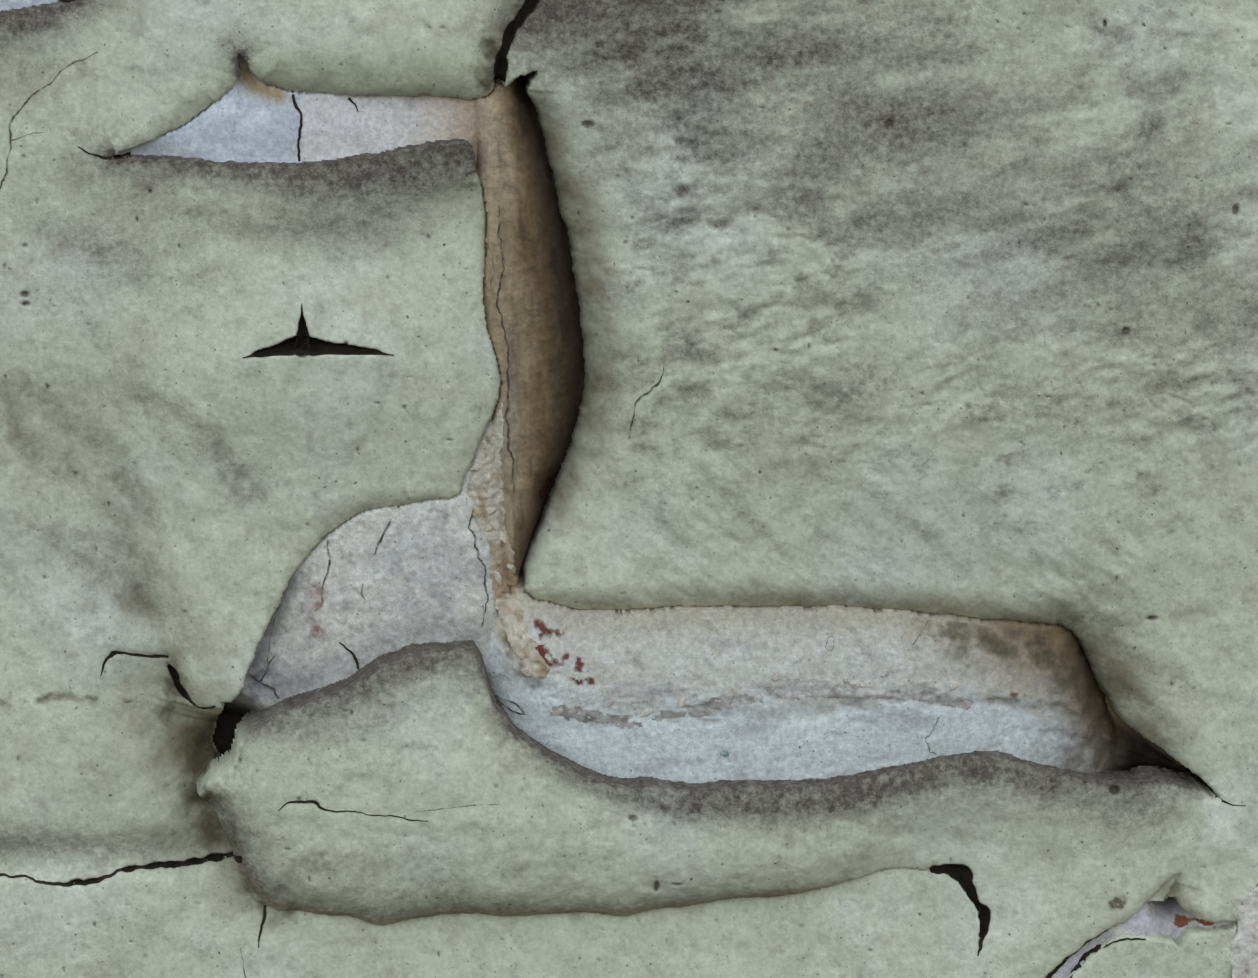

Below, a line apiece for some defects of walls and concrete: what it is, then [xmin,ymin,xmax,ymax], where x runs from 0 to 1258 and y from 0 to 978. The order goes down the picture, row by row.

peeling [0,0,58,11]
crack [493,0,539,82]
crack [242,335,394,358]
peeling [118,55,1192,783]
crack [100,651,216,709]
crack [0,852,241,887]
peeling [1044,887,1258,978]